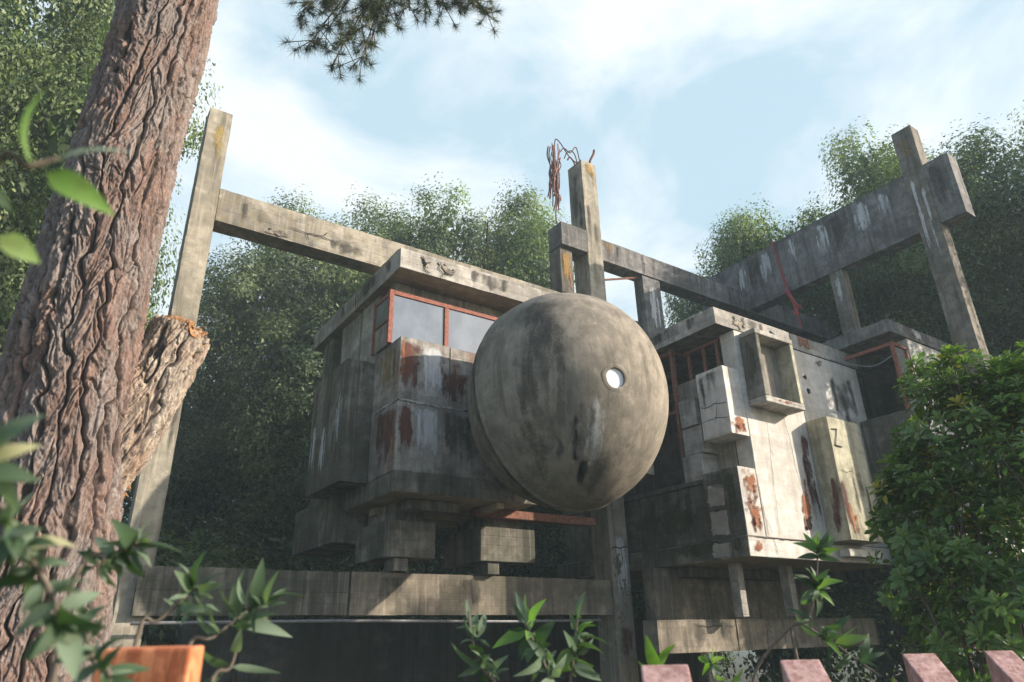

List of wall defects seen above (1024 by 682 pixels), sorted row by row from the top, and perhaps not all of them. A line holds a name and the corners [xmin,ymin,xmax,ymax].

rust [547,144,562,224]
damp [816,194,890,254]
damp [911,165,945,249]
damp [739,253,771,290]
rust [401,340,420,388]
rust [441,365,467,402]
rust [376,405,413,464]
damp [574,400,609,493]
rust [732,416,747,433]
rust [742,469,763,551]
rust [801,436,878,538]